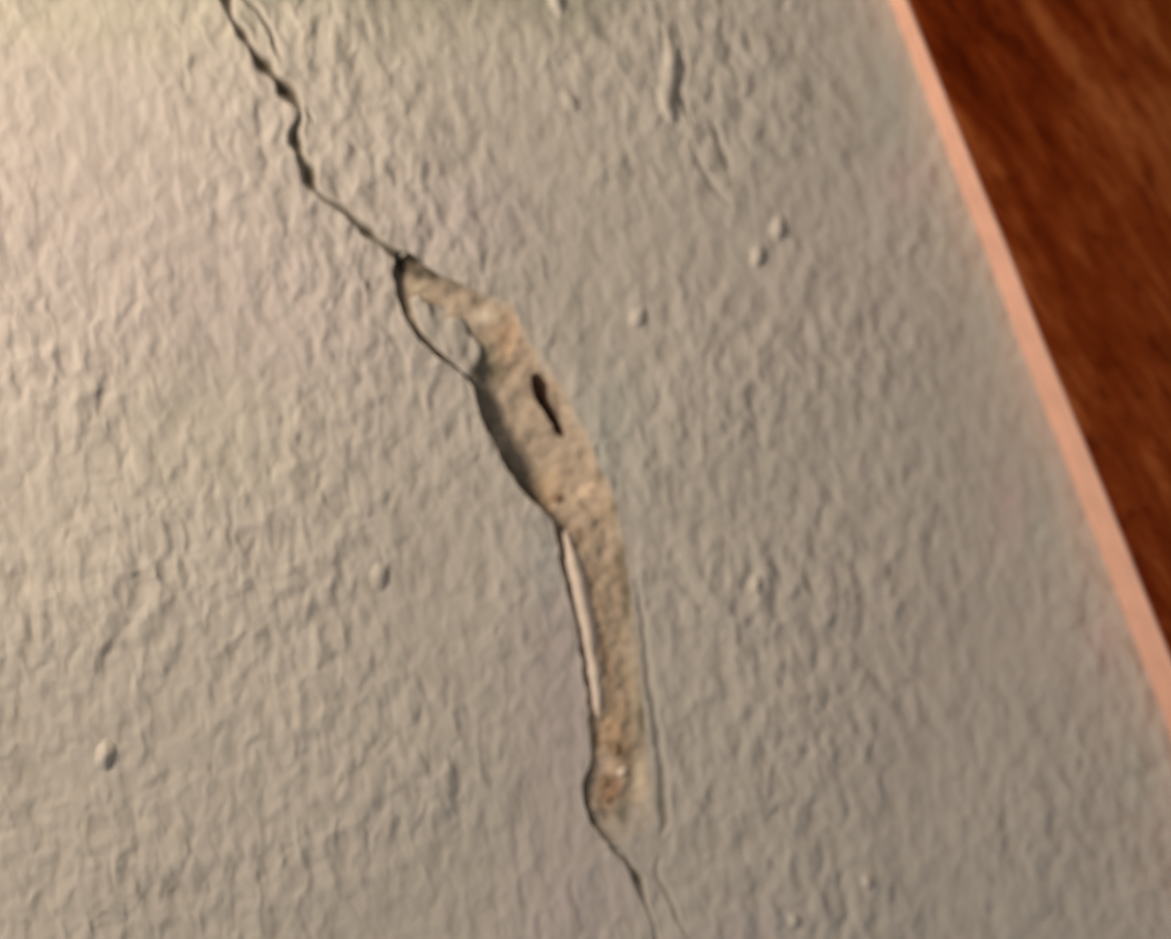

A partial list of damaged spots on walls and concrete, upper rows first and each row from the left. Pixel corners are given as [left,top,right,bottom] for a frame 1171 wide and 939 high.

crack [218,0,406,262]
crack [656,17,734,208]
crack [607,840,688,939]